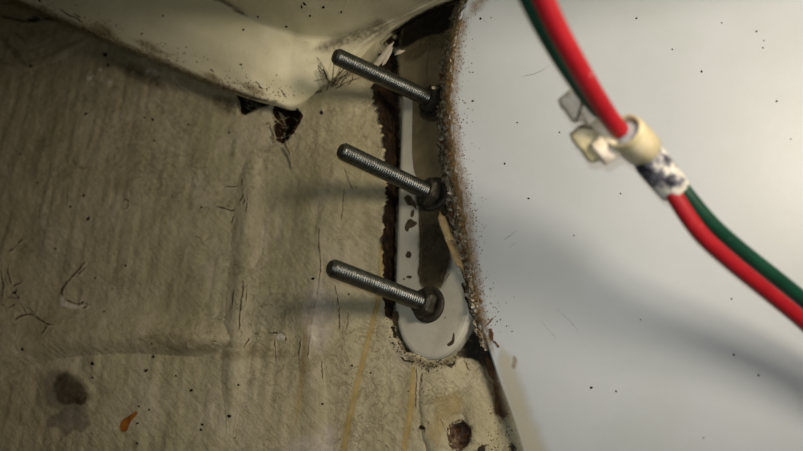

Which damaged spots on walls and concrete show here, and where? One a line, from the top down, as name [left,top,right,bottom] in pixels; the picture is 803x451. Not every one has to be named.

peeling [373,28,446,88]
peeling [412,100,442,180]
corrosion [450,0,513,348]
peeling [403,195,465,289]
leakage [47,374,87,433]
corrosion [485,357,508,419]